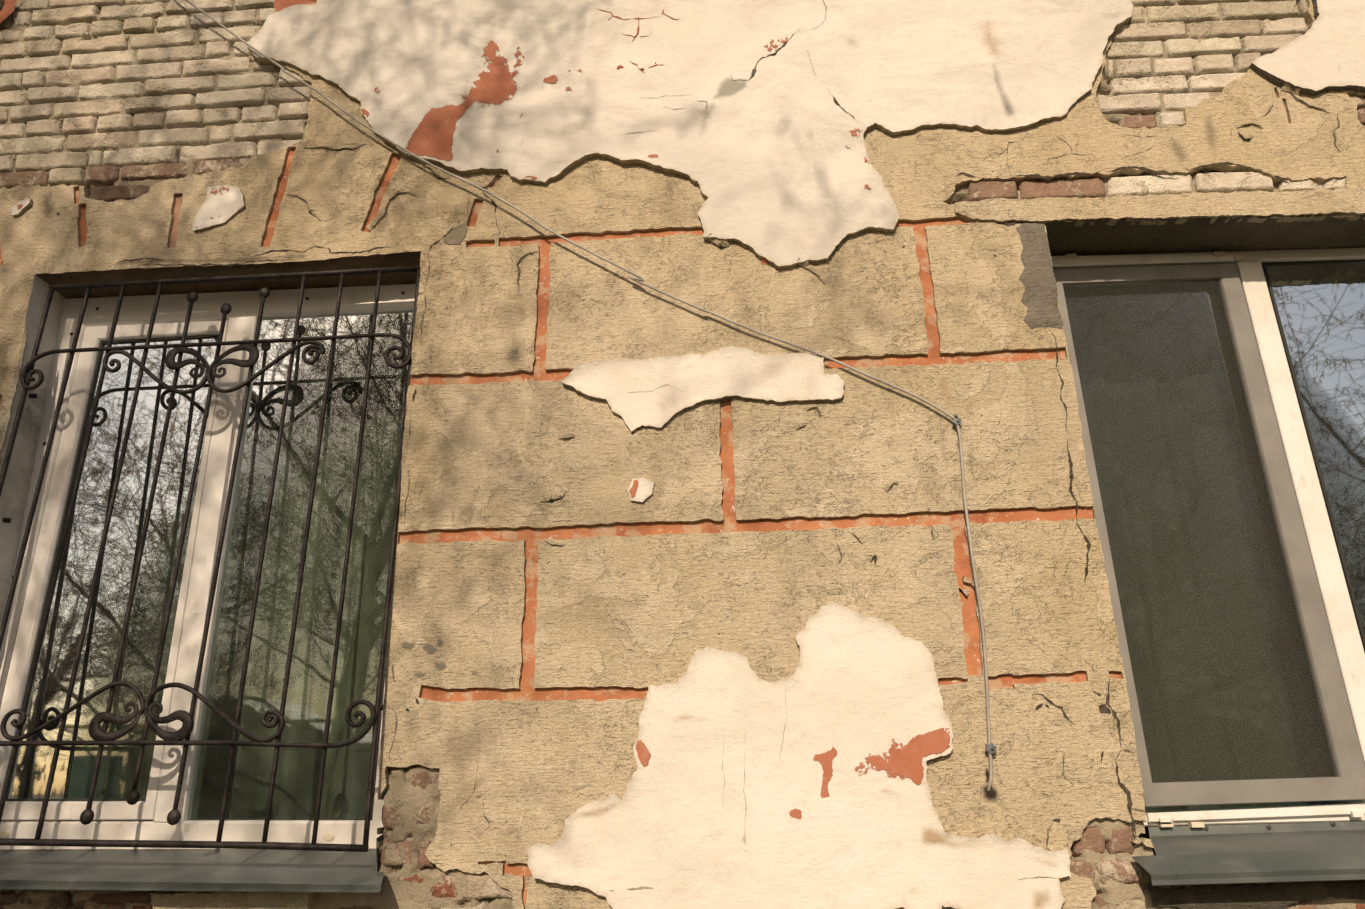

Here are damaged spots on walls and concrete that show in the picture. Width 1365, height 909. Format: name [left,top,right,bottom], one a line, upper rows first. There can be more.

peeling [0,0,1365,269]
crack [1050,330,1091,582]
spalling [0,765,513,909]
peeling [527,602,1365,909]
crack [1019,678,1146,880]